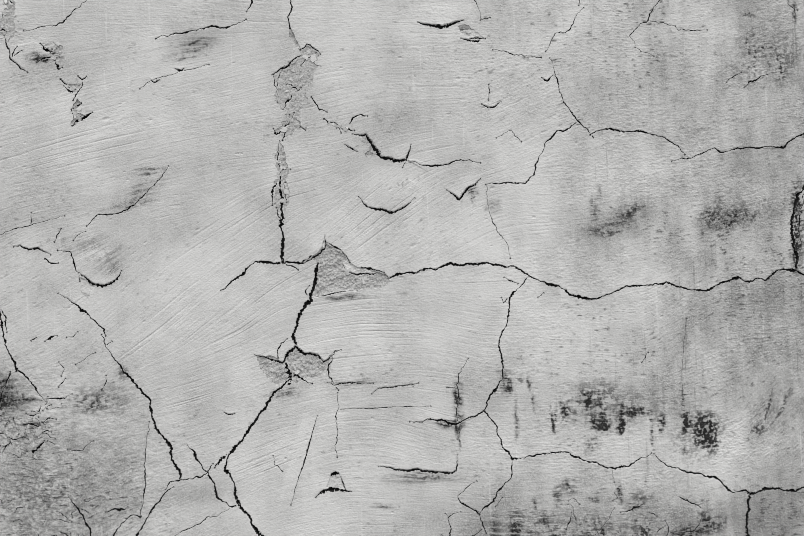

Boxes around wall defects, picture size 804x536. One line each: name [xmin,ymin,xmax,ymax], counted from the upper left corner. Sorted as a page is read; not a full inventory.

crack [4,0,88,73]
crack [156,0,254,39]
crack [286,0,294,29]
spalling [272,29,322,220]
crack [311,97,354,133]
crack [0,43,341,536]
spalling [288,231,390,299]
crack [390,0,804,536]
peeling [252,327,422,395]
water stain [583,389,665,444]
water stain [682,412,717,448]